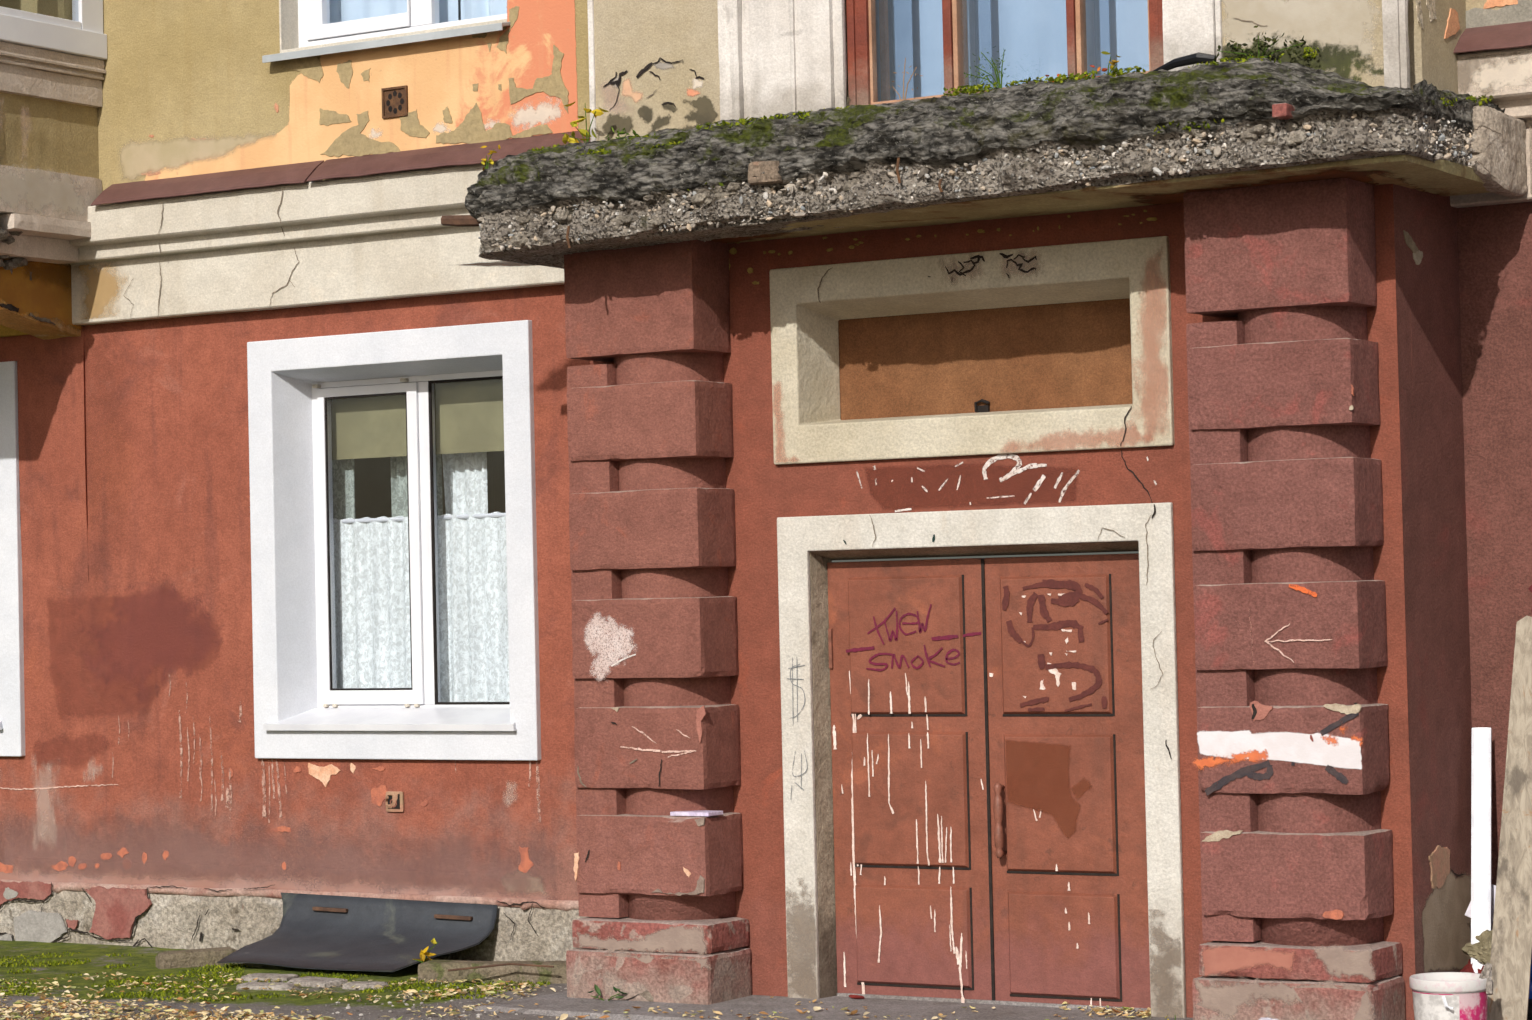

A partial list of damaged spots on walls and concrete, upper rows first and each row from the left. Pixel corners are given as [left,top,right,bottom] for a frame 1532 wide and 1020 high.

spalling [1415,0,1532,39]
peeling [120,0,578,181]
peeling [612,77,642,102]
peeling [687,79,703,96]
spalling [0,228,32,281]
crack [269,189,299,306]
spalling [0,303,56,325]
crack [1098,406,1156,585]
peeling [0,848,169,943]